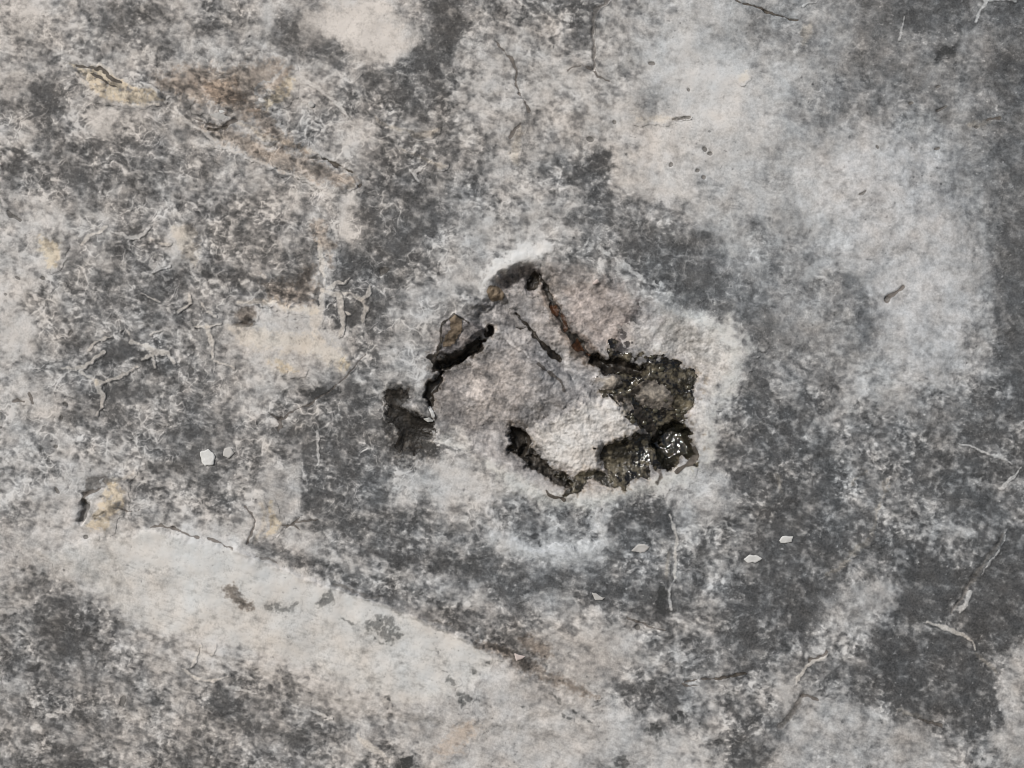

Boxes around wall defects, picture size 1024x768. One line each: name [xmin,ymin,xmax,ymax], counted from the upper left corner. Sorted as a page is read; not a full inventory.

spalling [417,236,769,516]